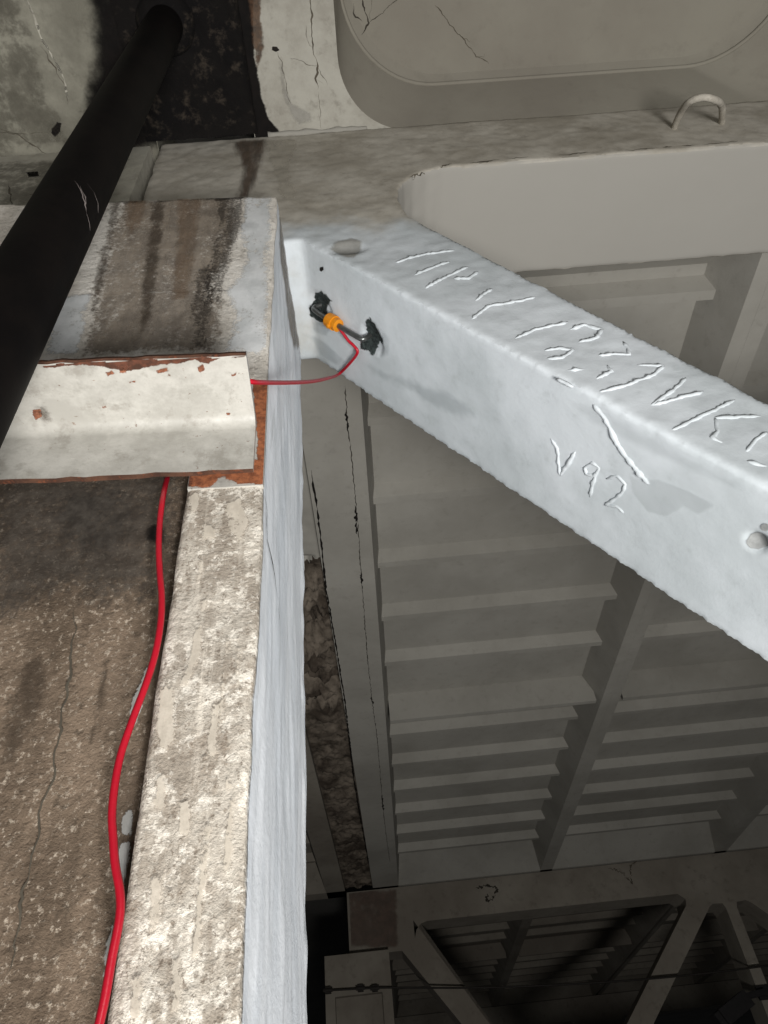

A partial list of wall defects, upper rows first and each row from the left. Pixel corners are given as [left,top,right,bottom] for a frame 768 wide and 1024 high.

damp [87,0,123,105]
damp [236,0,279,196]
crack [297,0,327,127]
crack [353,0,397,33]
crack [437,7,486,61]
damp [85,199,233,354]
rust [43,355,219,383]
rust [188,385,267,488]
crack [311,388,390,863]
crack [6,610,77,975]
crack [476,884,499,903]